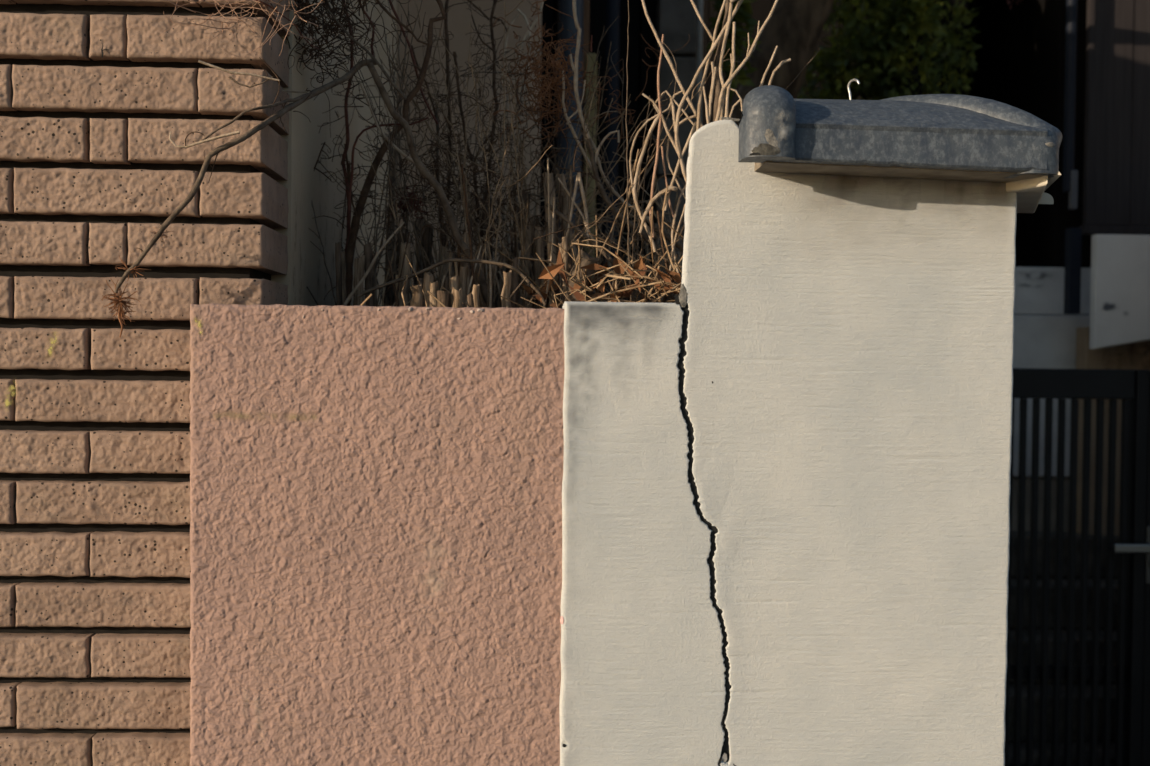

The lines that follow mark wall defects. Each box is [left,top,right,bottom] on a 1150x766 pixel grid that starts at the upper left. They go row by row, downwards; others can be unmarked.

crack [674,294,736,766]